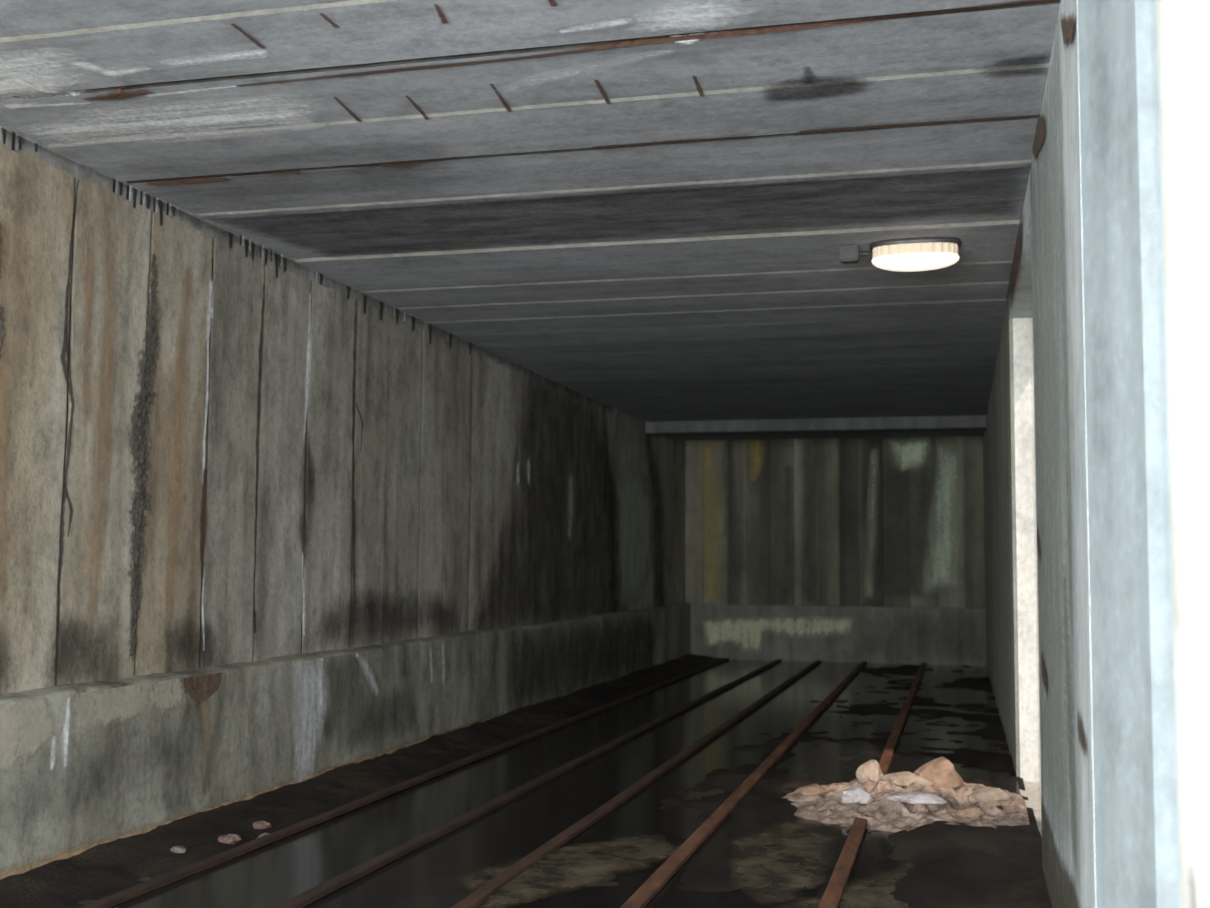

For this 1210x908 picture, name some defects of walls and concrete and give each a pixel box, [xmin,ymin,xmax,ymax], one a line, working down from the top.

corrosion [232,0,1061,87]
water stain [768,71,861,100]
water stain [202,281,212,482]
crack [56,179,79,673]
water stain [302,304,314,635]
water stain [434,326,653,698]
water stain [170,596,213,664]
water stain [324,598,453,639]
water stain [704,617,852,650]